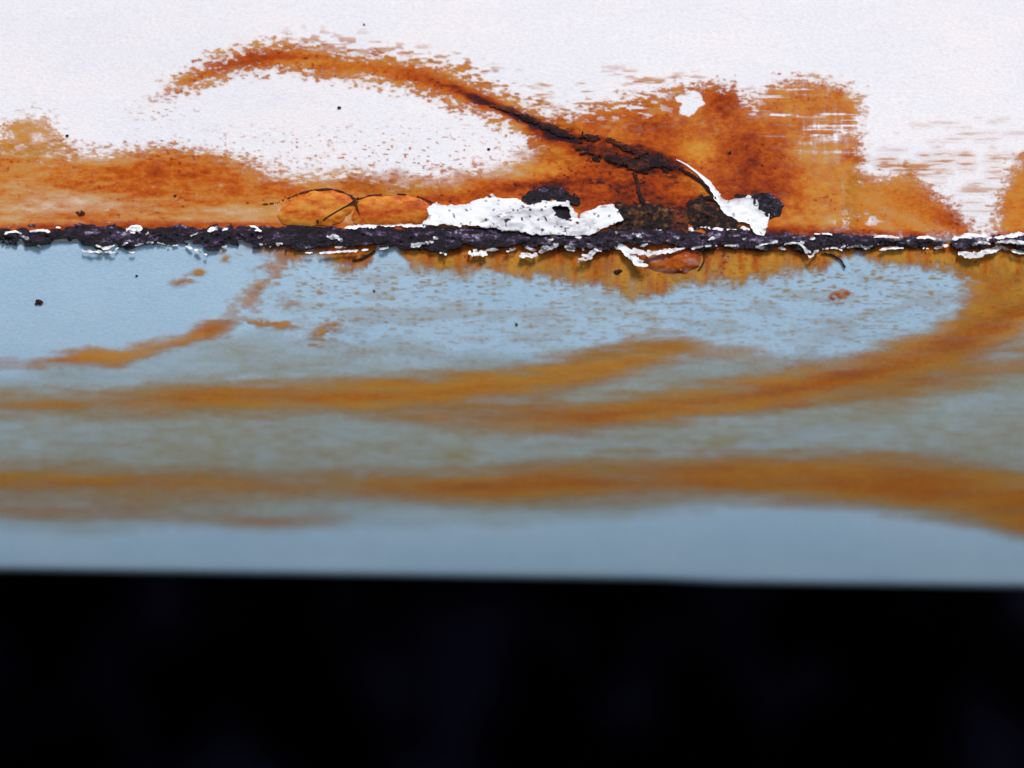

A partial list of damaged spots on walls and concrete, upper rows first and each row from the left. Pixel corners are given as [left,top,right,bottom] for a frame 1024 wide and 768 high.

crack [490,105,717,205]
rust [0,36,1024,431]
peeling [305,159,904,267]
peeling [916,232,1024,259]
rust [0,452,1024,534]